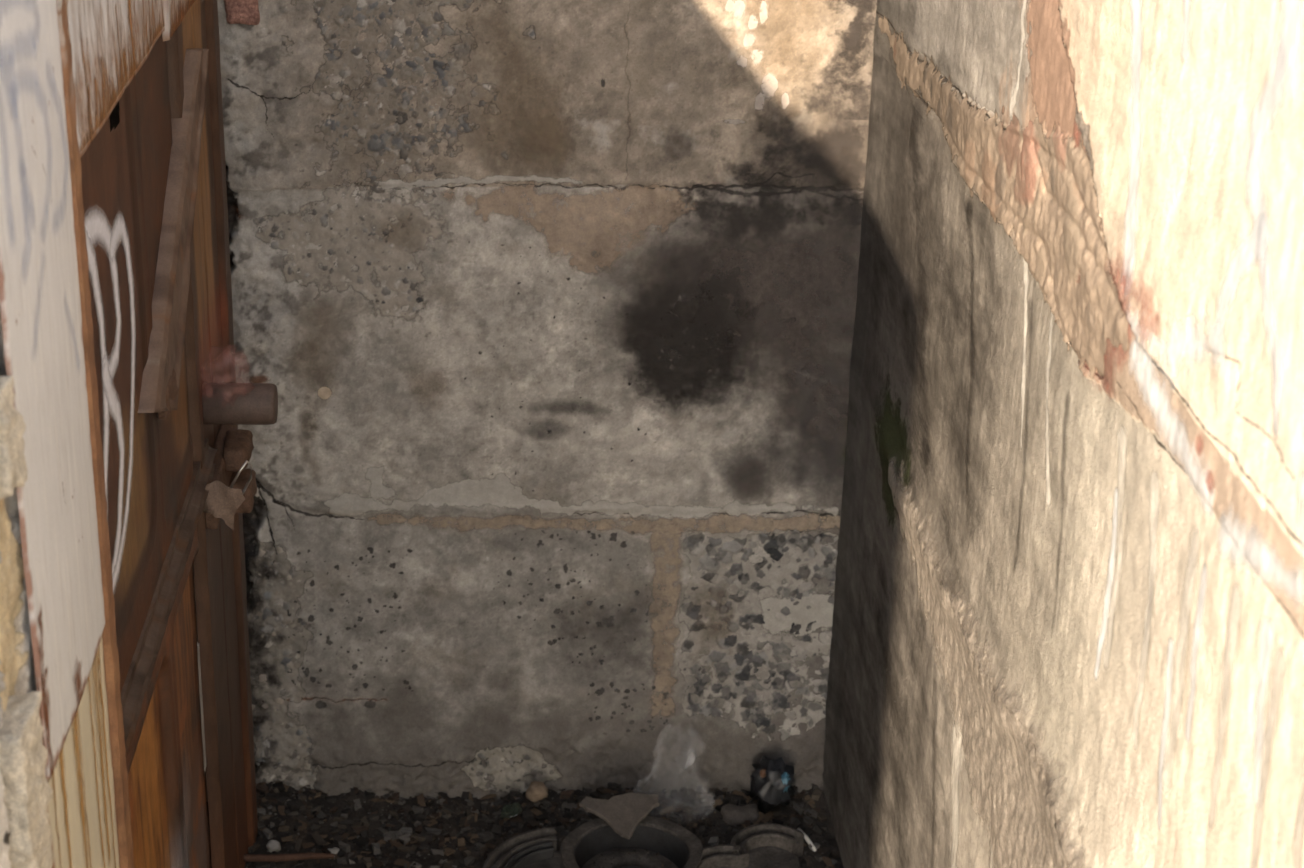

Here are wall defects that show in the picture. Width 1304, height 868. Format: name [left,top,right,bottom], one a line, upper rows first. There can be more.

rust [76,0,196,151]
peeling [725,0,789,110]
spalling [226,166,236,227]
spalling [254,0,697,321]
crack [334,172,864,201]
leakage [624,0,873,497]
crack [761,509,840,517]
rust [38,610,116,868]